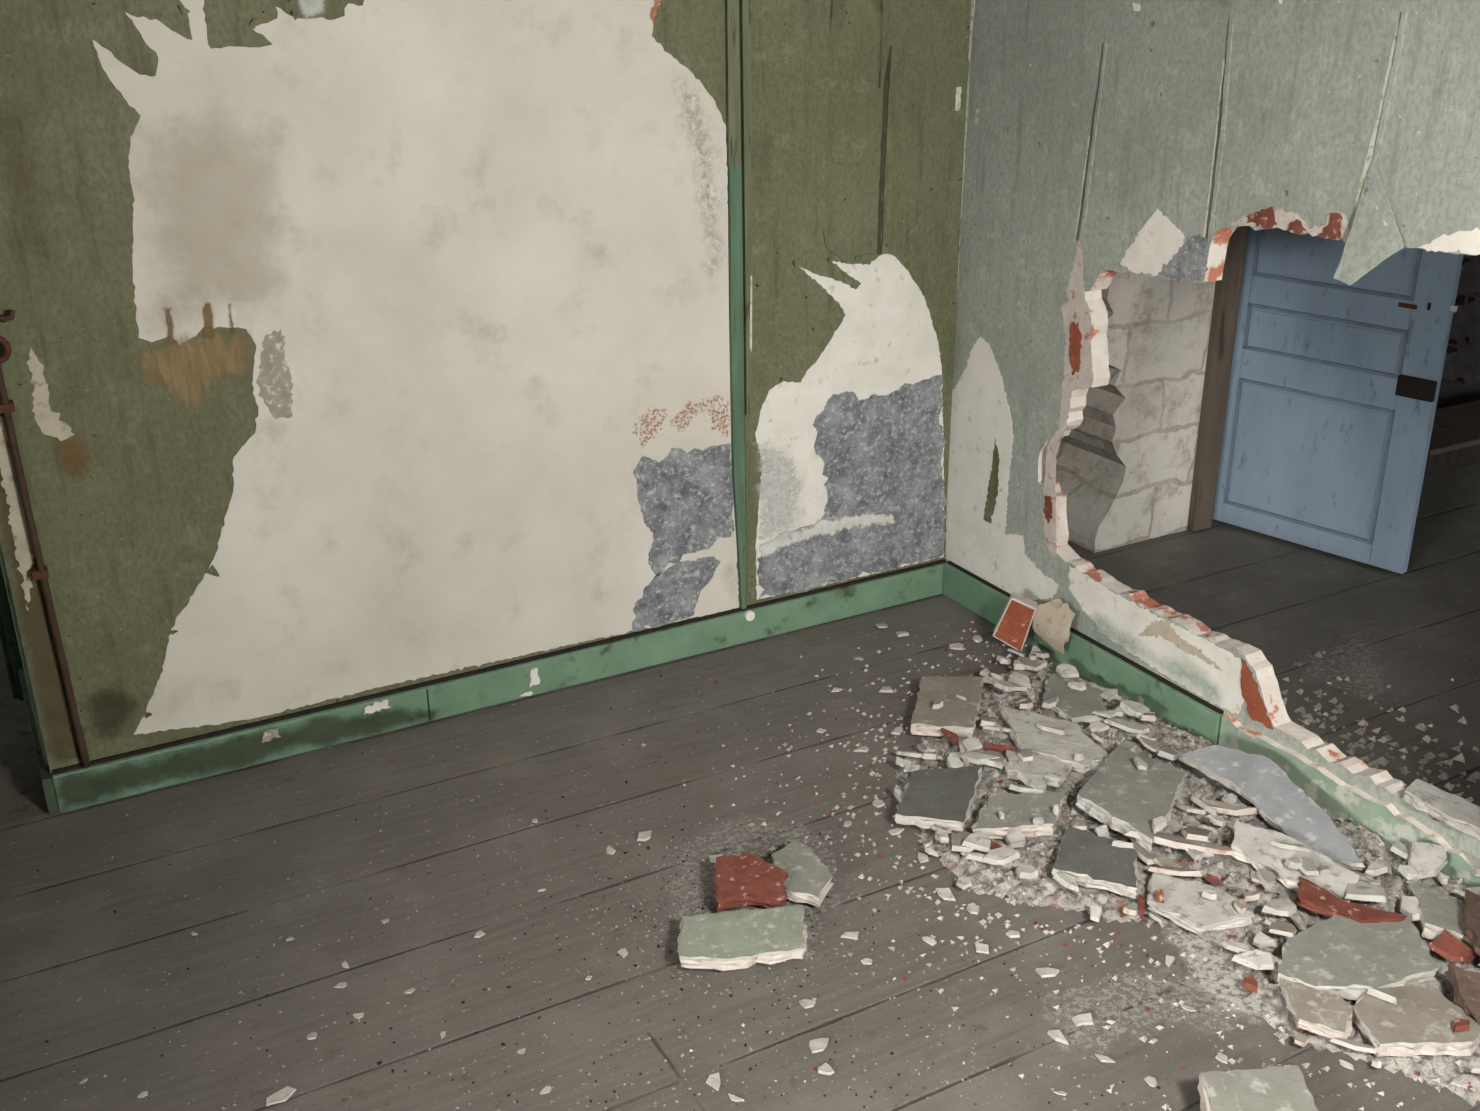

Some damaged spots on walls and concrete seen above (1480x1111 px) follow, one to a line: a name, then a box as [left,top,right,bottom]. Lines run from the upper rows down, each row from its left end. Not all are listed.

spalling [1229,207,1350,242]
spalling [1419,227,1480,255]
peeling [27,348,74,441]
peeling [92,0,1273,743]
peeling [0,416,34,610]